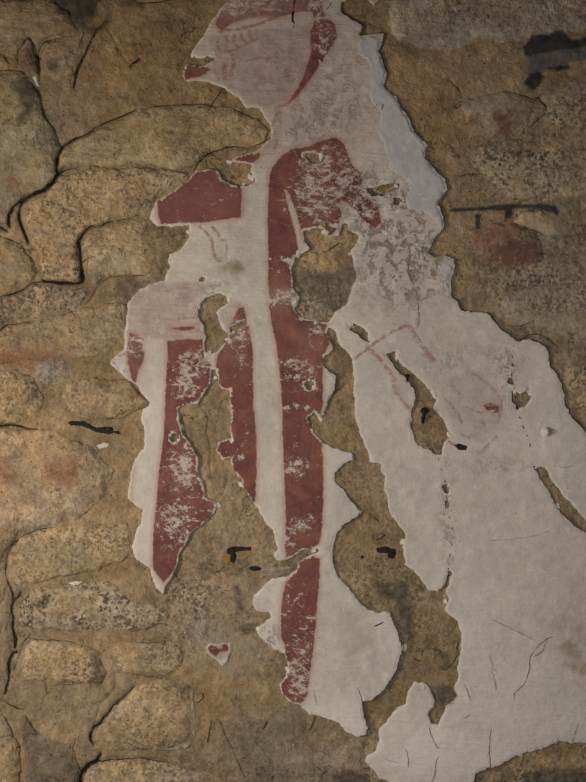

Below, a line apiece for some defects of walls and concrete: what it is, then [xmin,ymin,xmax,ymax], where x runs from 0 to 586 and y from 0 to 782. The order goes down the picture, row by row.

crack [70,20,140,84]
crack [0,110,136,246]
crack [194,138,270,170]
spalling [368,183,402,205]
crack [0,215,143,315]
spalling [198,294,247,357]
spalling [508,378,533,409]
spalling [292,223,462,751]
spalling [534,465,586,532]
crack [0,527,97,710]
crack [72,674,194,782]
spalling [475,739,586,782]